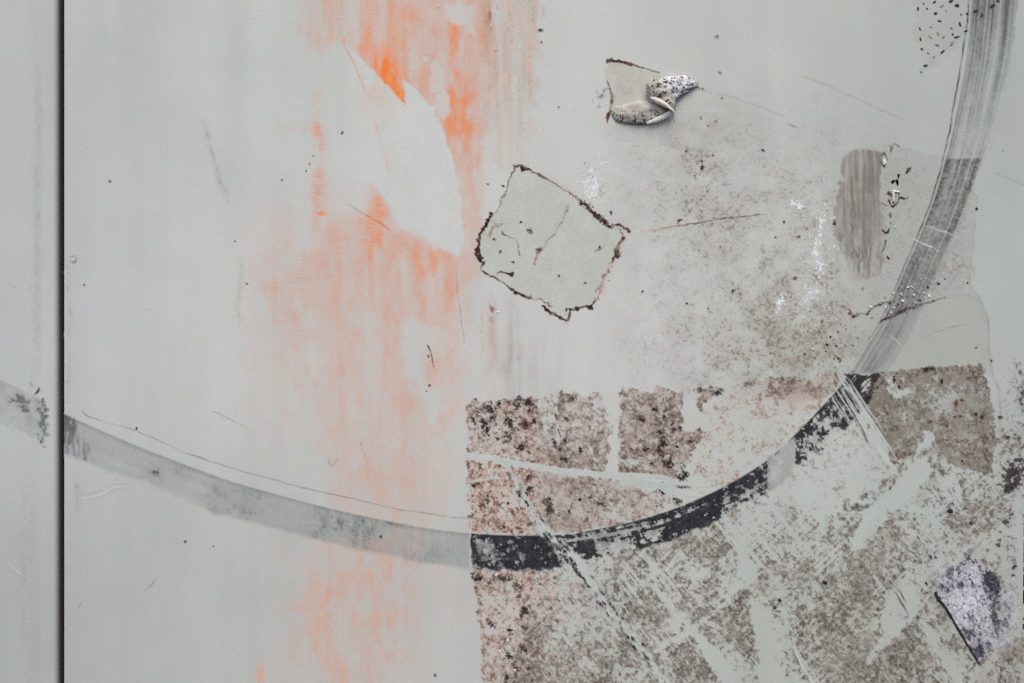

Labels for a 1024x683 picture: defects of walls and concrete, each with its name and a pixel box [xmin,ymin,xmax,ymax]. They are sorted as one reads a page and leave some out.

rust [476,0,547,175]
peeling [591,56,742,152]
peeling [473,163,632,327]
rust [479,291,501,400]